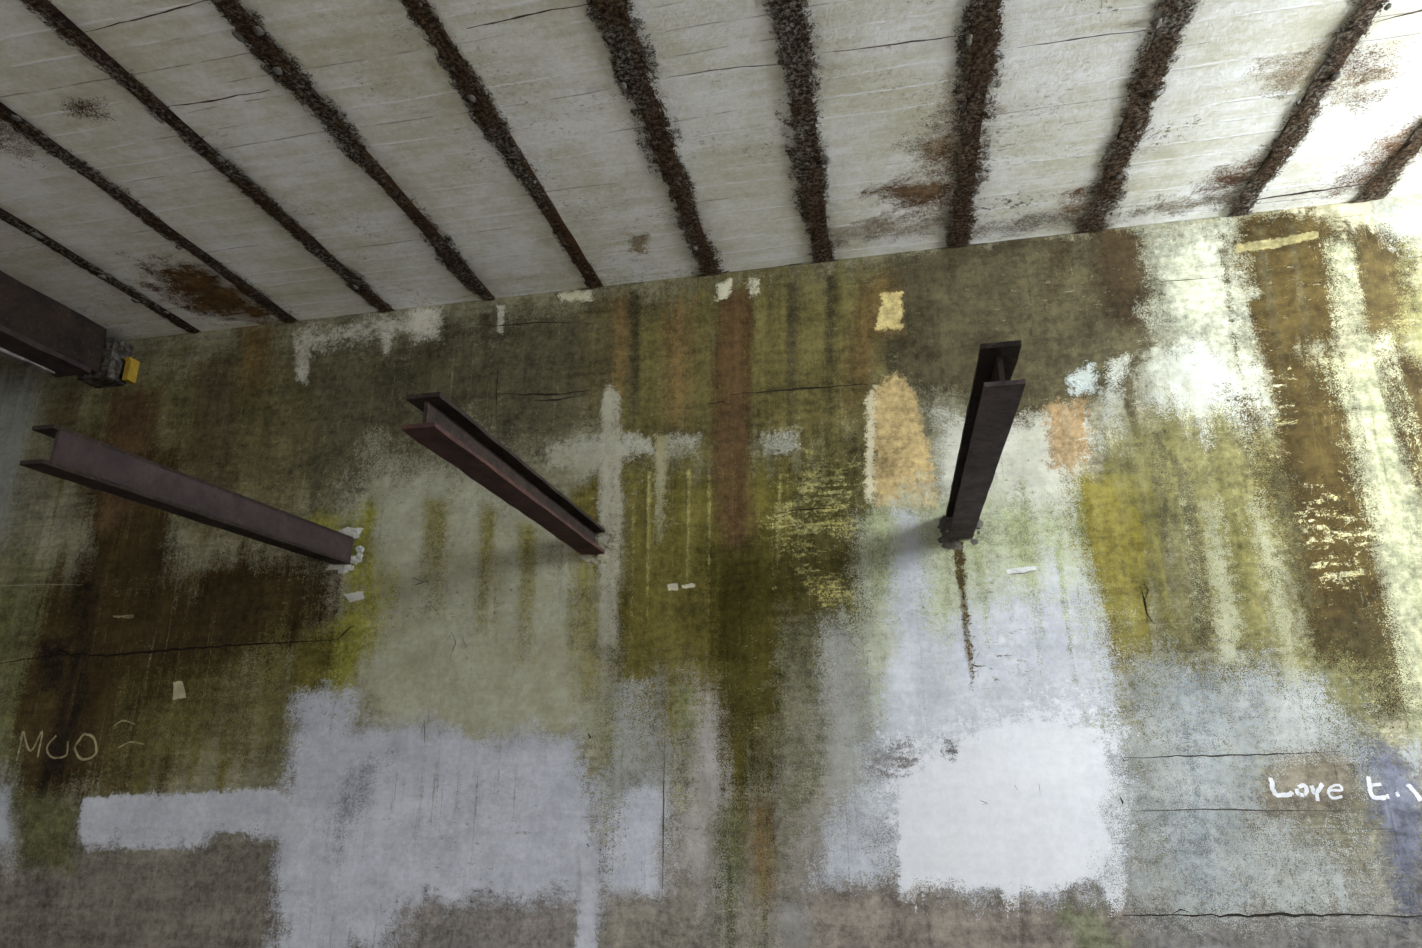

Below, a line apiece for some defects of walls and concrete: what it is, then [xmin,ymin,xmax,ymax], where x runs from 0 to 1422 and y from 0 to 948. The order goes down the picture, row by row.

spalling [0,0,396,334]
rust [116,249,299,327]
spalling [207,0,495,301]
spalling [399,0,604,289]
spalling [583,0,729,277]
spalling [762,0,839,263]
spalling [940,0,1011,248]
spalling [1075,0,1205,233]
spalling [1227,0,1392,217]
leakage [0,194,1422,948]
rust [952,540,978,691]
crack [1122,909,1422,918]